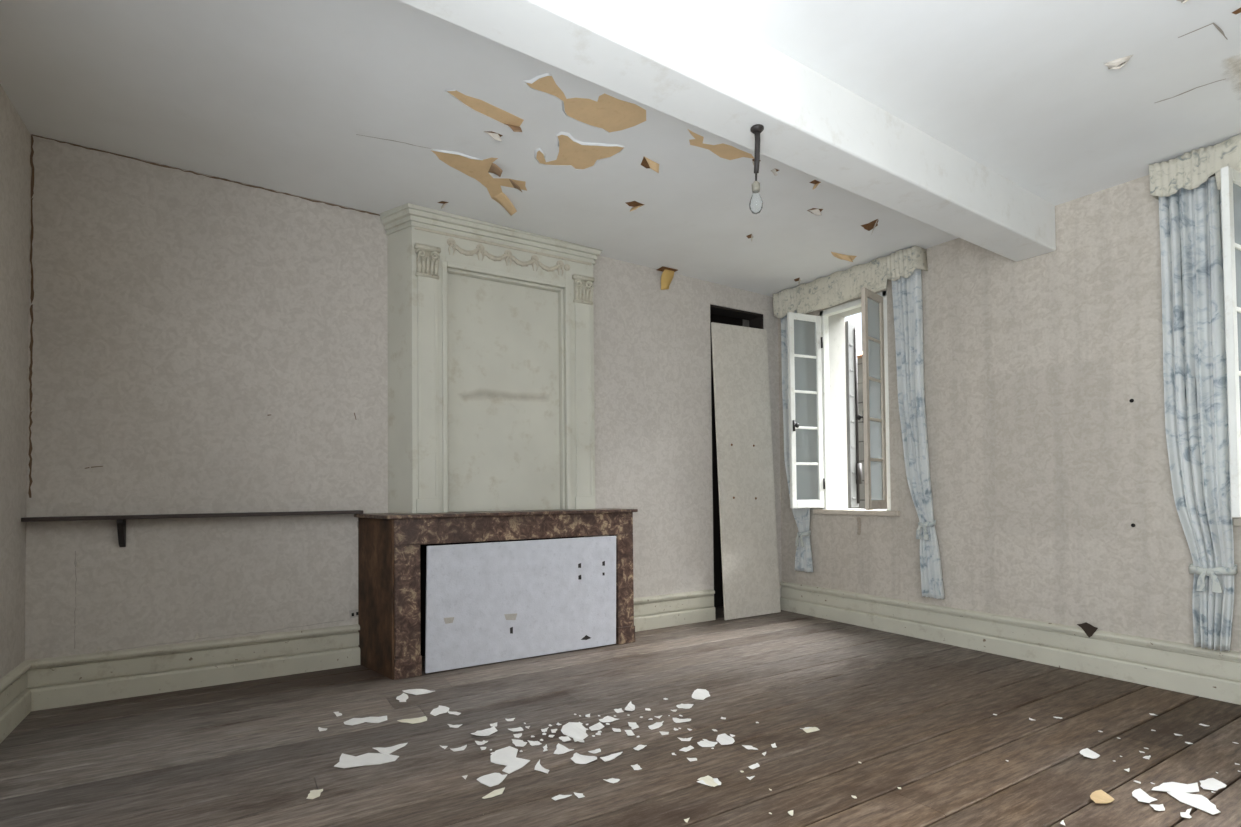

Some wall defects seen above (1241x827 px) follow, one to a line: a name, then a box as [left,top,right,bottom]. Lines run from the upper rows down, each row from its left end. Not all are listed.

peeling [429,149,527,216]
peeling [445,90,524,141]
peeling [524,73,646,170]
peeling [688,129,779,175]